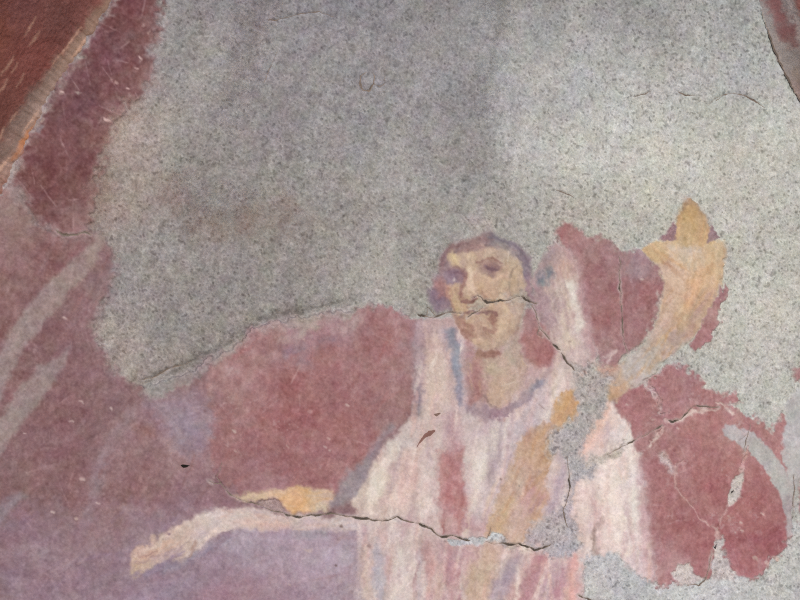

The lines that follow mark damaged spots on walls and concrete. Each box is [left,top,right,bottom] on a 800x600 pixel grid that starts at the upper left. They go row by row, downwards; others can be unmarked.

spalling [0,0,800,434]
crack [418,295,575,371]
spalling [524,292,800,600]
crack [607,405,718,455]
crack [209,462,551,551]
crack [563,458,575,531]